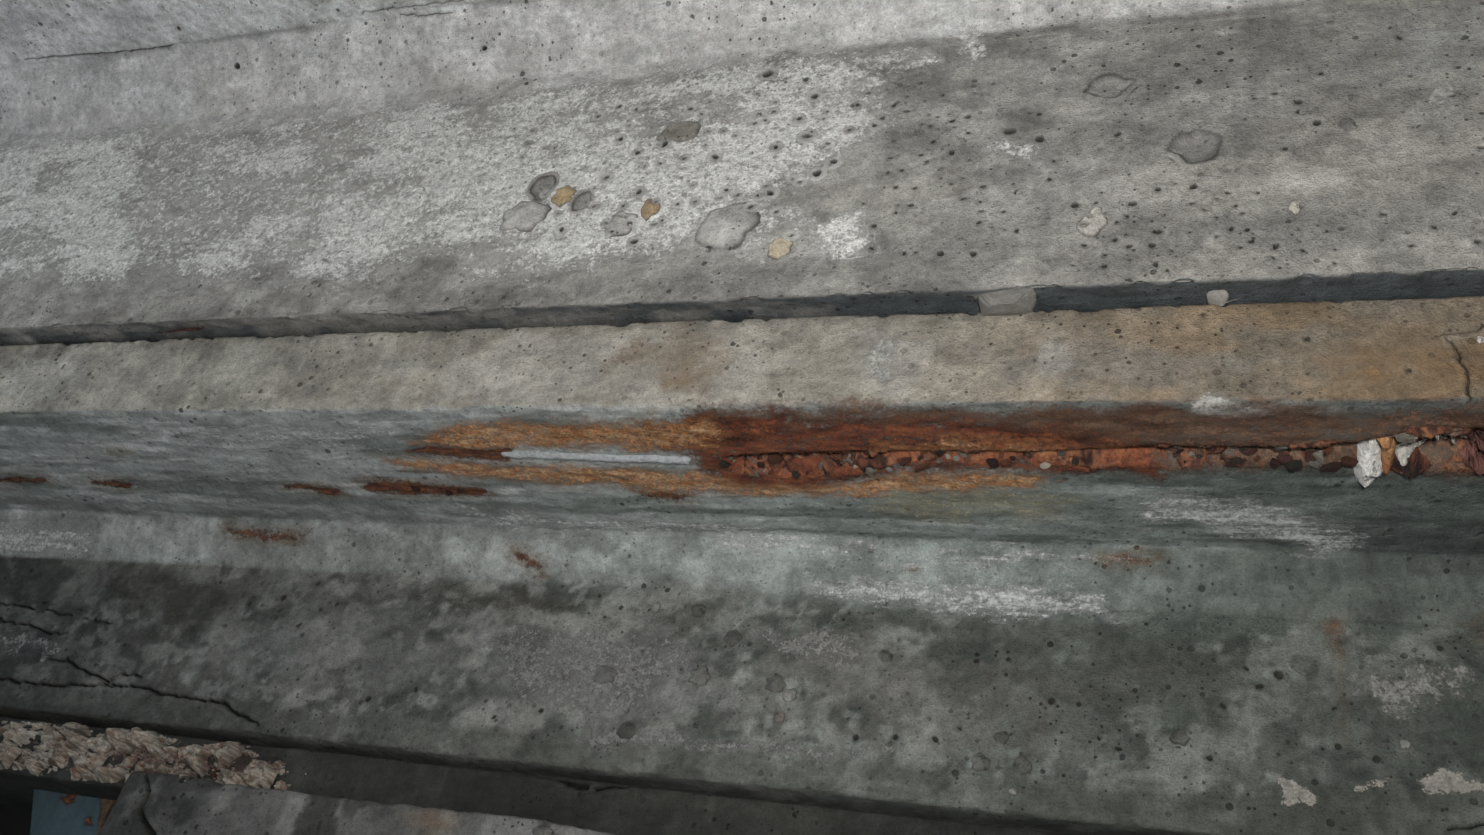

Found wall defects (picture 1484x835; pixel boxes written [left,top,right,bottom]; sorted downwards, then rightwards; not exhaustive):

crack [1427,317,1484,407]
peeling [1191,392,1269,418]
corrosion [285,484,339,495]
spalling [717,447,1116,480]
corrosion [357,398,1484,498]
spalling [1153,440,1358,473]
spalling [1367,425,1484,479]
crack [0,597,264,732]
spalling [0,721,306,790]